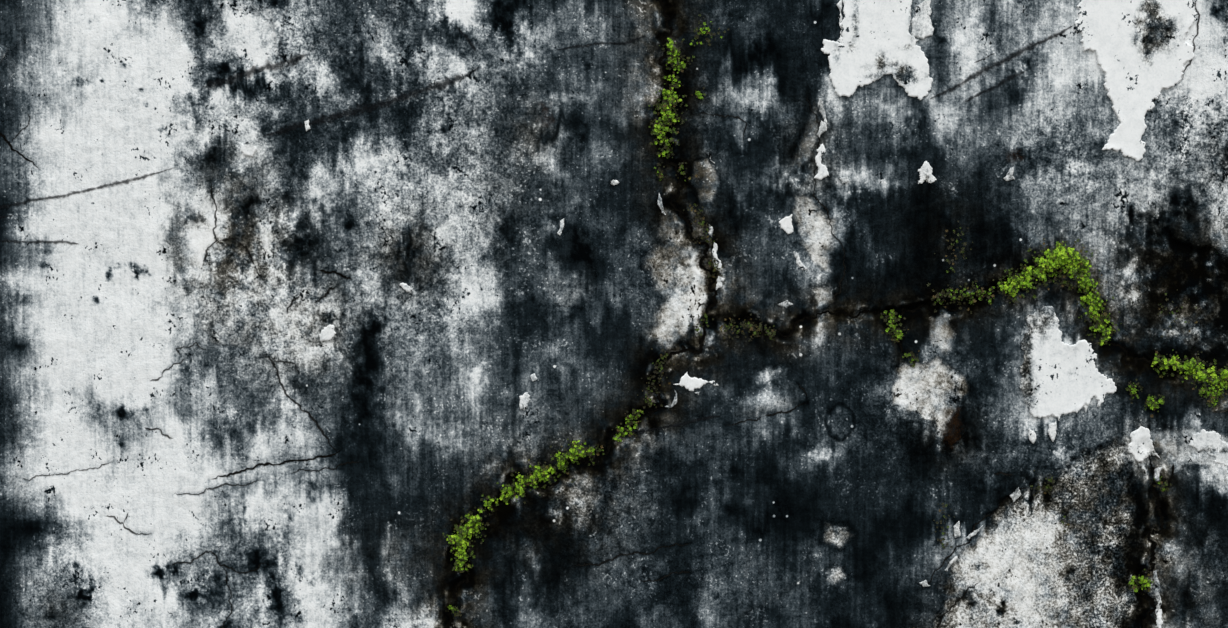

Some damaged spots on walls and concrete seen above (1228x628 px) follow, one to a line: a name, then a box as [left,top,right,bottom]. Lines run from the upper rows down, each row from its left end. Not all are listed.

water stain [0,0,25,109]
peeling [821,0,934,100]
peeling [1074,0,1197,161]
water stain [0,384,97,628]
crack [22,461,113,481]
crack [107,513,152,535]
crack [173,551,265,628]
crack [174,351,360,495]
flaking render [779,194,837,307]
crack [445,0,1222,628]
peeling [1020,305,1117,444]
flaking render [919,426,1228,628]